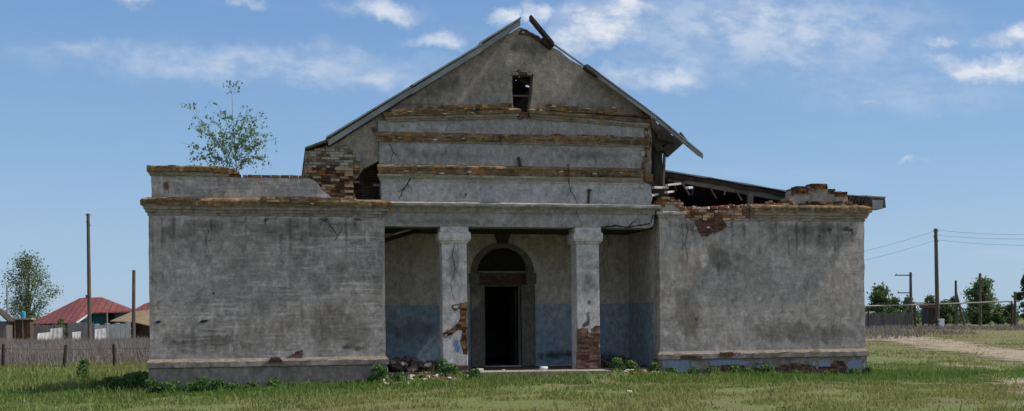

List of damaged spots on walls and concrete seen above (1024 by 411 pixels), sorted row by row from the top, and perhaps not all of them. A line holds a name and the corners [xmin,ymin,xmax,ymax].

spalling [259,165,360,204]
crack [565,164,654,272]
spalling [693,220,730,237]
spalling [443,302,469,371]
spalling [576,326,601,369]